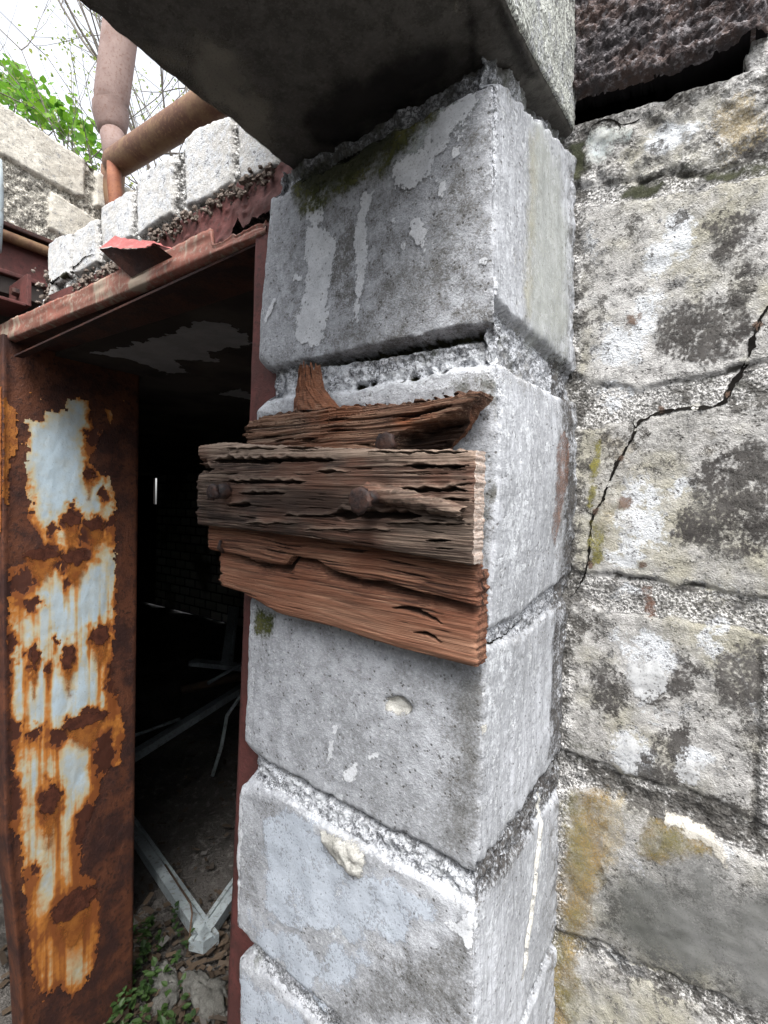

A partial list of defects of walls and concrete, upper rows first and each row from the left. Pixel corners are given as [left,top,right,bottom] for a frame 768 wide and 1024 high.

peeling [389,92,479,198]
peeling [352,189,375,323]
peeling [401,217,428,253]
peeling [89,320,252,375]
rust [1,397,19,505]
crack [570,306,768,597]
rust [21,510,107,584]
rust [30,642,76,698]
rust [90,626,111,665]
rust [62,710,108,749]
rust [39,783,61,848]
rust [50,887,97,948]